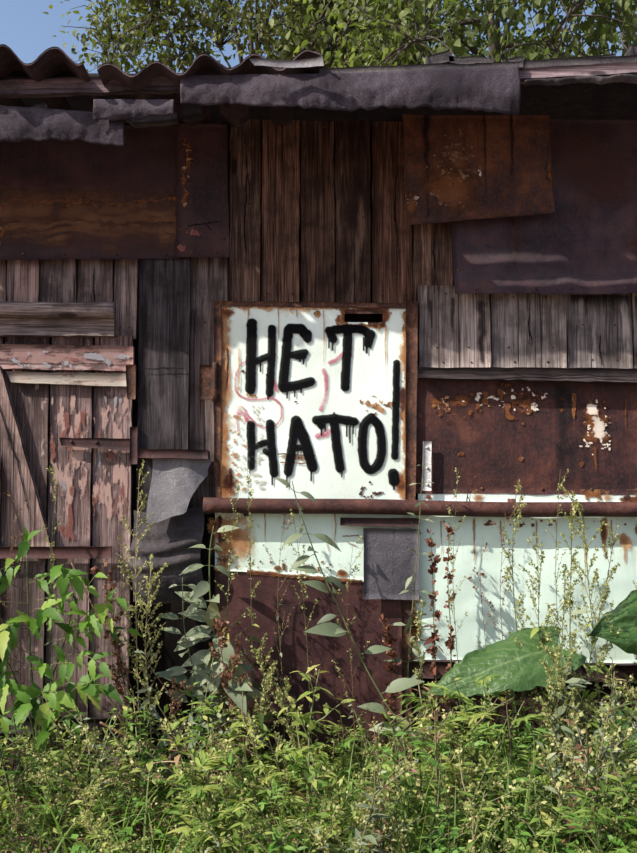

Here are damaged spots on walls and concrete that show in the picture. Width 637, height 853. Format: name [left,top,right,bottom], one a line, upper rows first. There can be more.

corrosion [0,124,229,260]
corrosion [402,114,637,295]
peeling [11,350,131,377]
peeling [50,392,129,541]
corrosion [220,306,392,498]
corrosion [396,311,406,499]
corrosion [416,379,637,502]
peeling [572,394,611,470]
corrosion [208,515,362,583]
corrosion [473,518,557,564]
corrosion [578,518,637,562]